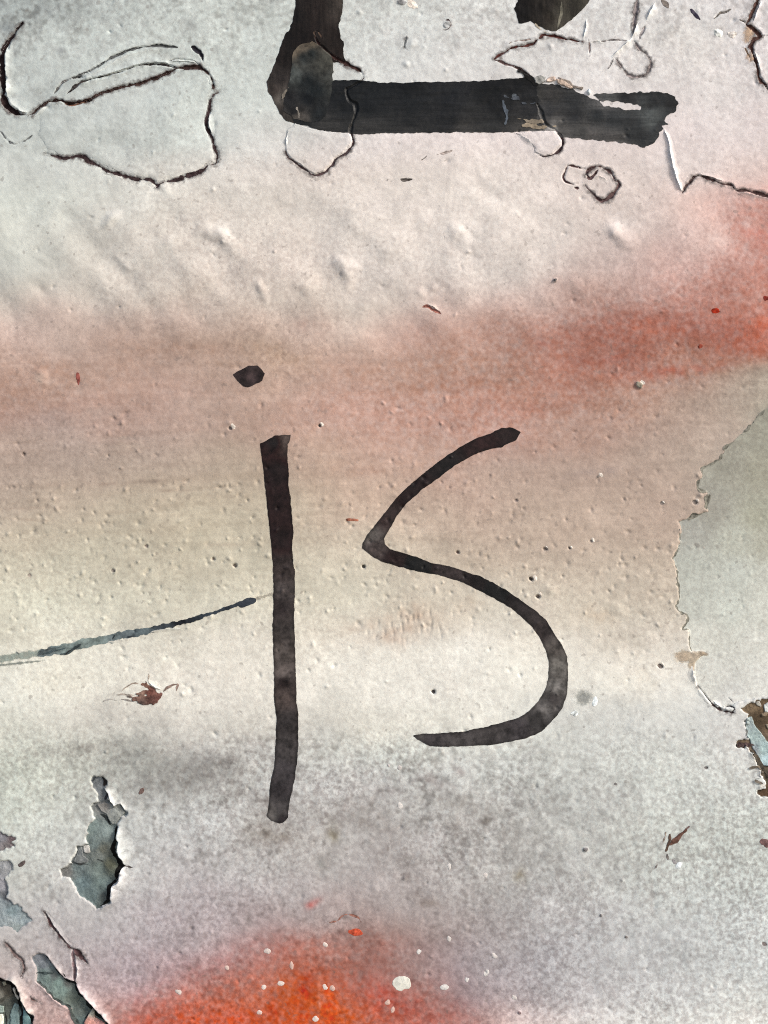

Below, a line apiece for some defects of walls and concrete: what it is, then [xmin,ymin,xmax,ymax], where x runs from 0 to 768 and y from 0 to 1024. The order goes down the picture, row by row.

crack [492,0,658,79]
crack [714,0,768,90]
crack [0,21,219,189]
crack [284,130,355,177]
crack [518,134,621,203]
crack [663,128,768,202]
peeling [672,408,768,797]
peeling [0,832,32,932]
peeling [61,776,134,912]
peeling [0,953,115,1024]